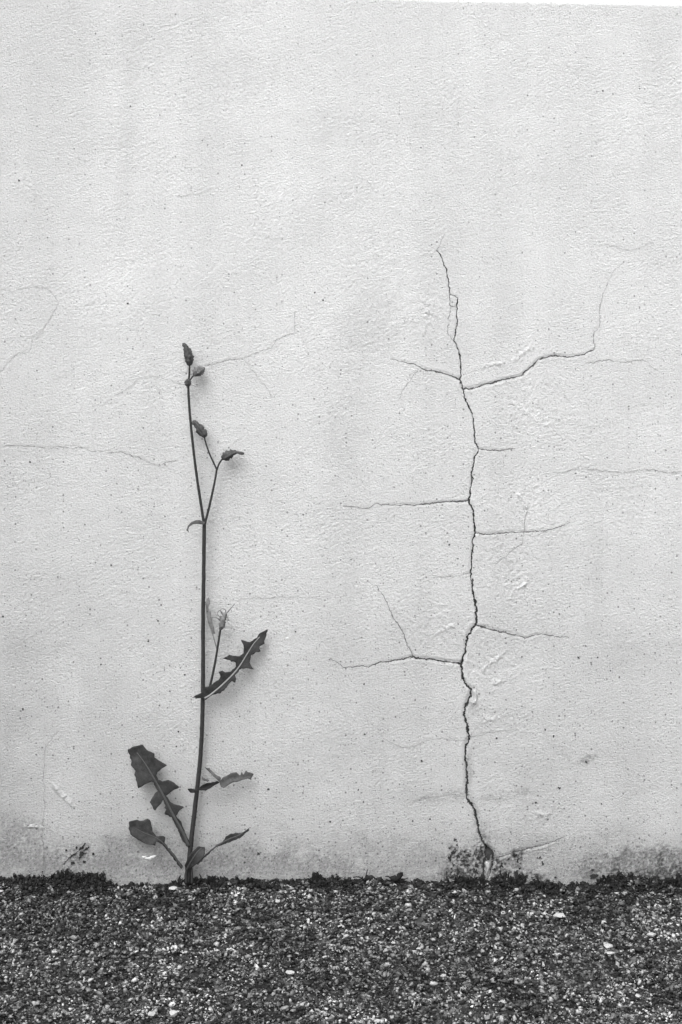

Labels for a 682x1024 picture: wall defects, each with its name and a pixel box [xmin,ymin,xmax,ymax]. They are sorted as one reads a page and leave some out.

crack [330,238,656,880]